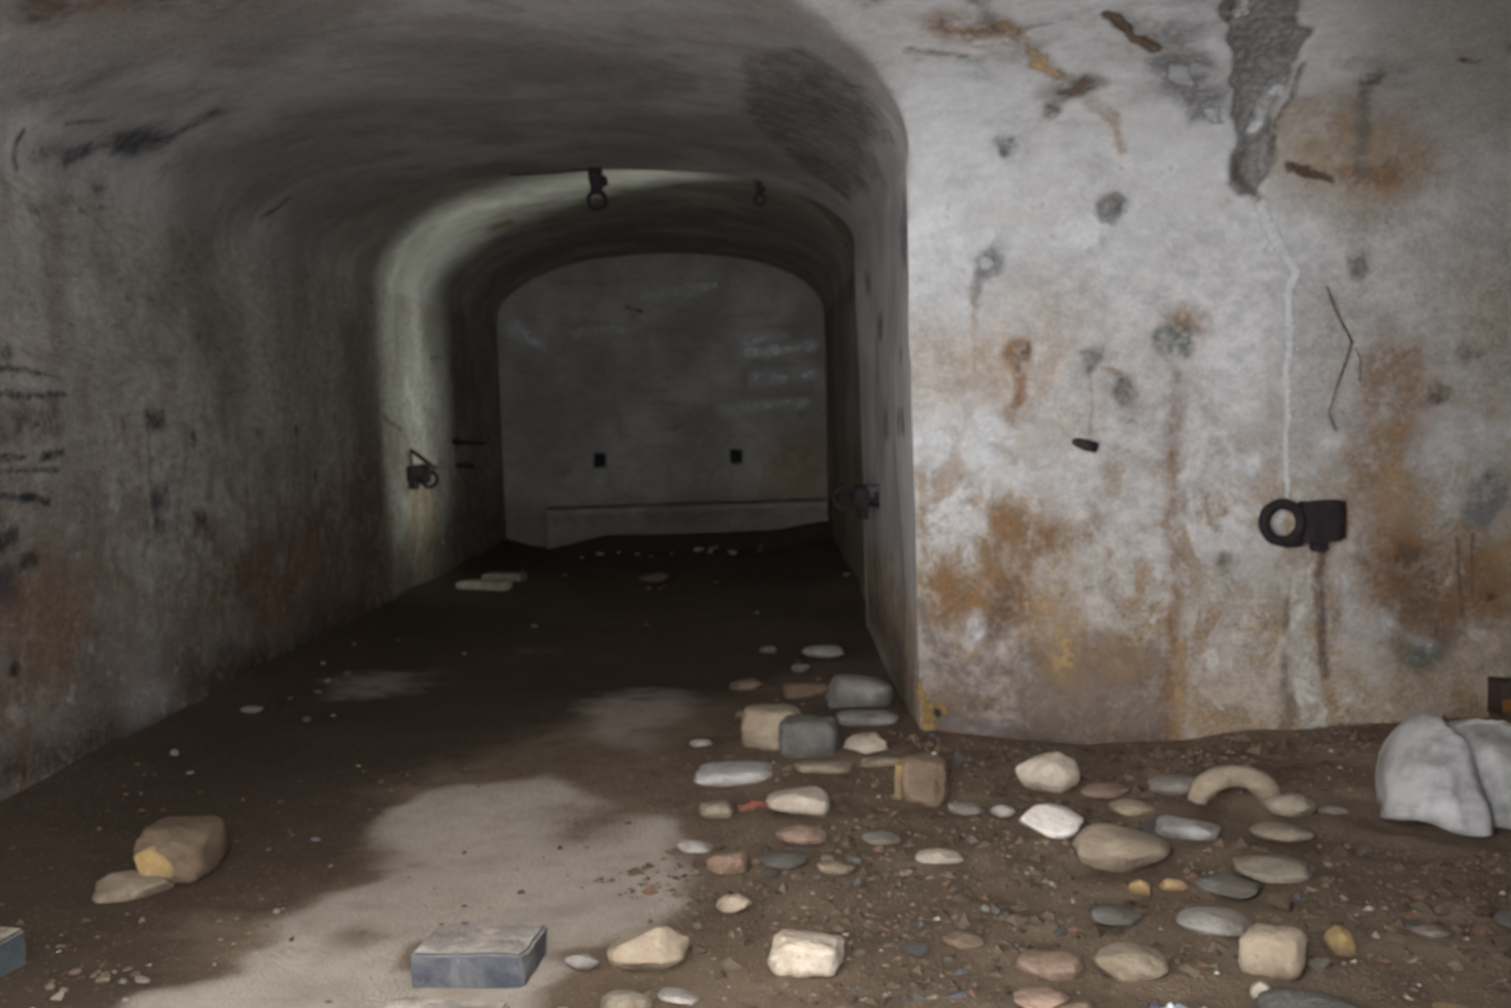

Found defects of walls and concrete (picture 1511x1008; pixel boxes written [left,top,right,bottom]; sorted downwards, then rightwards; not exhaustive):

corrosion [936,18,1099,113]
spalling [1101,0,1333,203]